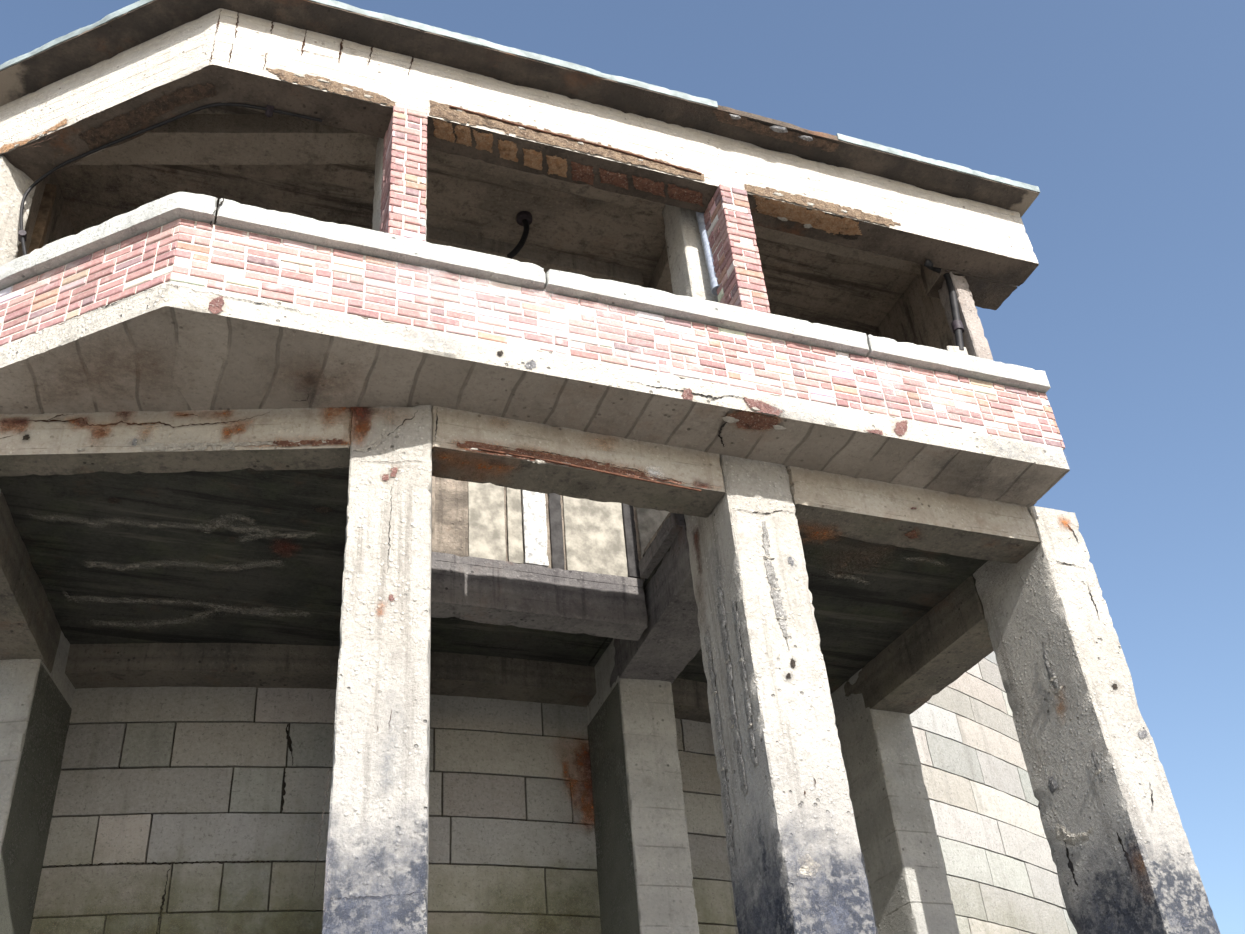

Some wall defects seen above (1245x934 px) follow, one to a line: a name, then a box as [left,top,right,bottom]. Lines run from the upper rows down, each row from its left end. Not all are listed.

spalling [266,68,396,106]
spalling [0,118,68,153]
spalling [429,100,705,181]
spalling [744,183,901,240]
rust [3,419,26,430]
crack [0,414,264,439]